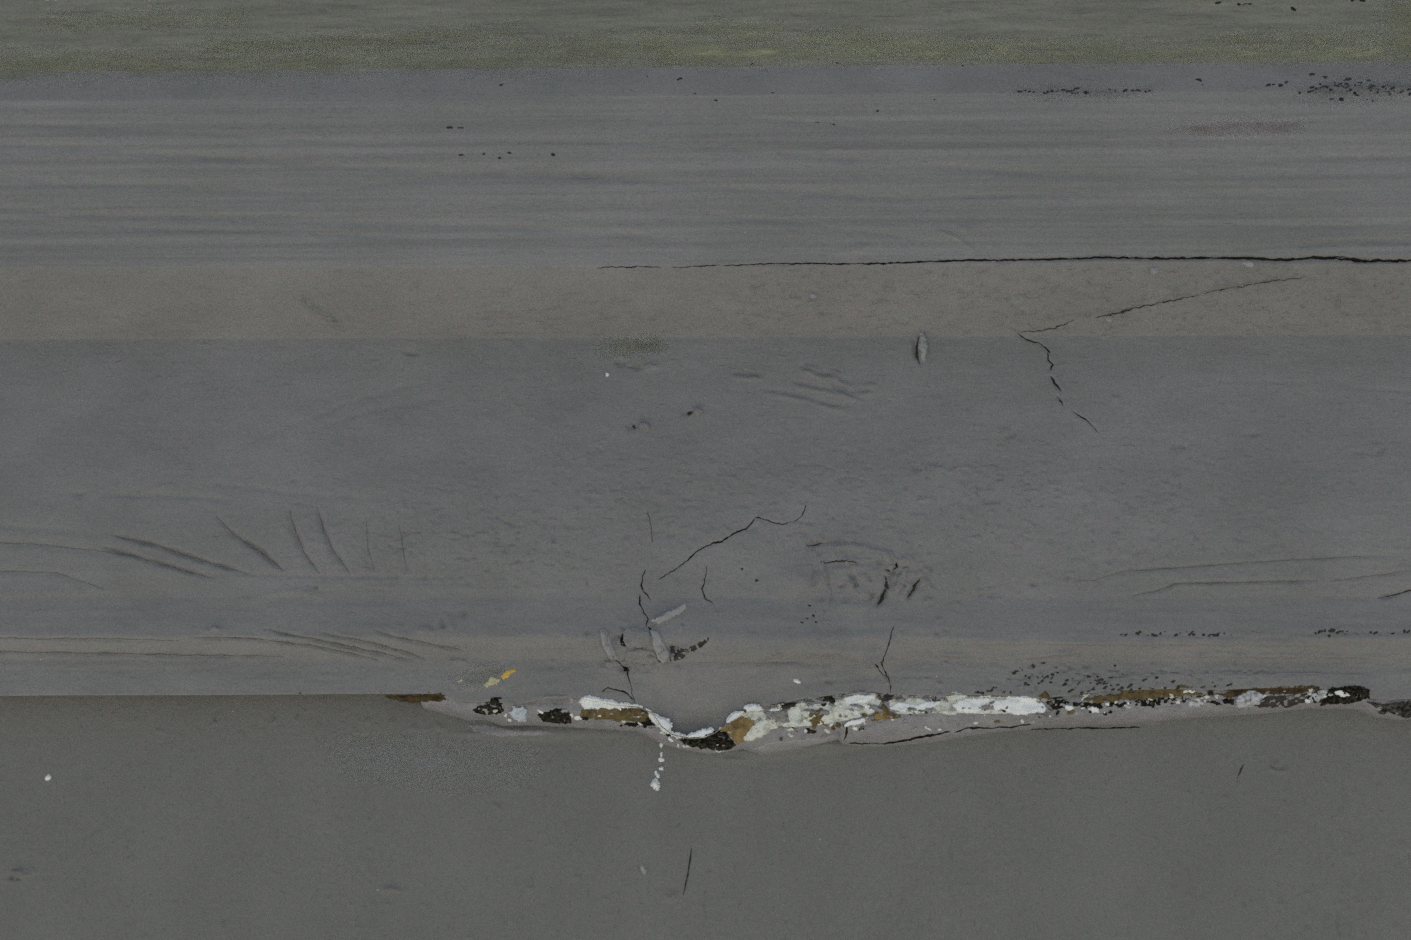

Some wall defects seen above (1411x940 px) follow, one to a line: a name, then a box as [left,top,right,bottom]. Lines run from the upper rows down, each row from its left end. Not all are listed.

crack [600,256,1411,433]
crack [639,506,806,625]
crack [602,660,635,703]
peeling [469,662,1264,753]
peeling [1305,685,1371,706]